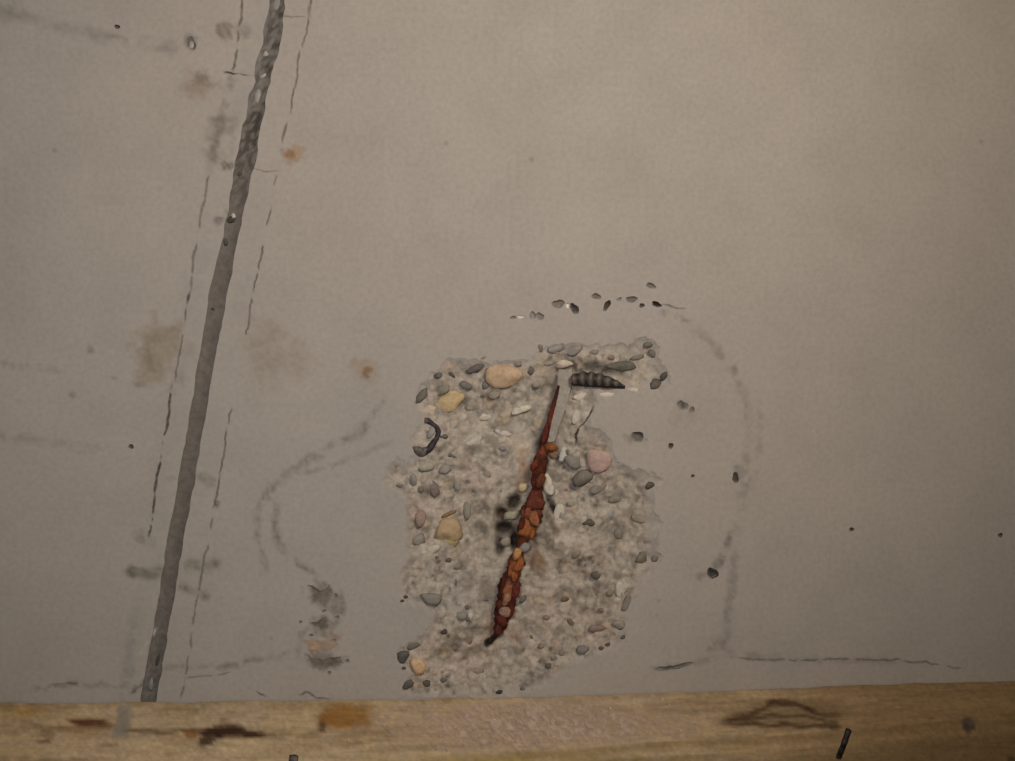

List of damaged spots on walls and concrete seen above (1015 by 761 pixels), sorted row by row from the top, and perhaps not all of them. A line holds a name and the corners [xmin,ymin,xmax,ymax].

crack [149,463,161,532]
crack [216,413,230,497]
spalling [382,336,671,698]
corrosion [517,422,558,540]
corrosion [489,548,543,637]